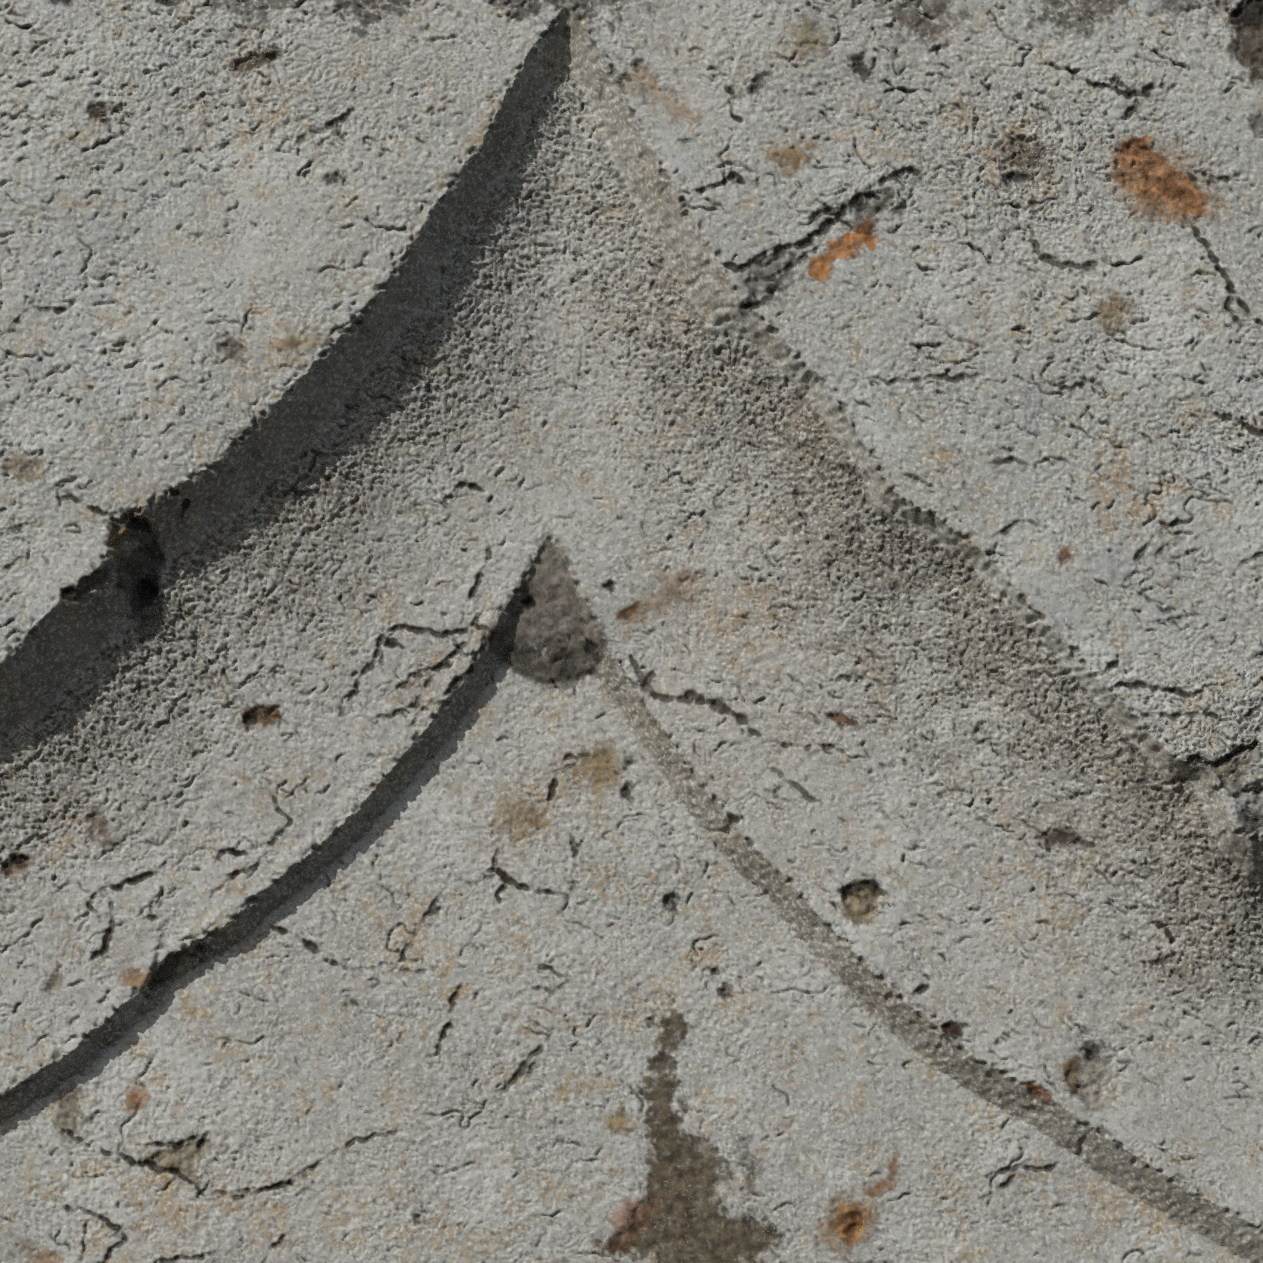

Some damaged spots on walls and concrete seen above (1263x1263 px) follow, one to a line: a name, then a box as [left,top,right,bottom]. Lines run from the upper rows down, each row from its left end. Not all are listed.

crack [696,171,759,193]
corrosion [1113,135,1214,219]
crack [725,166,919,305]
corrosion [808,218,877,282]
crack [1192,226,1263,326]
spalling [62,509,166,638]
crack [341,546,491,724]
crack [65,1129,396,1199]
leakage [594,1009,783,1263]
corrosion [866,1162,897,1195]
crack [64,1205,127,1263]
corrosion [832,1204,870,1246]